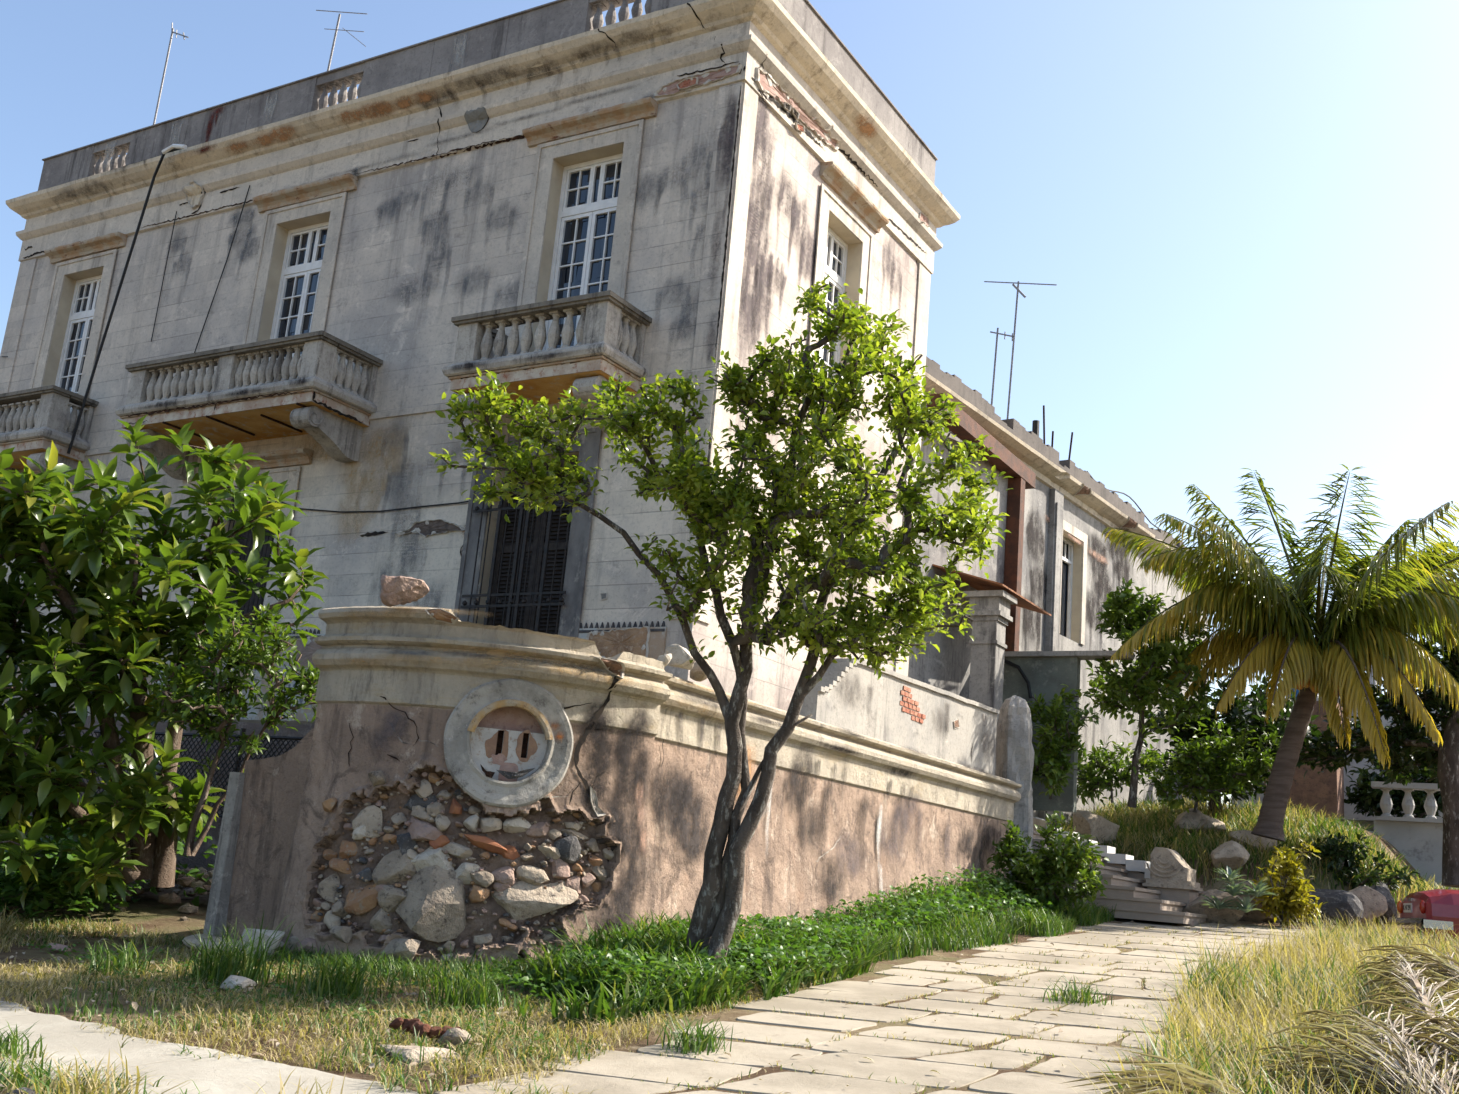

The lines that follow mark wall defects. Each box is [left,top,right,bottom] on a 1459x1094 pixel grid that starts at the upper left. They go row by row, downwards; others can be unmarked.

damp [718,102,736,175]
flaking render [654,64,841,152]
damp [741,92,816,337]
crack [677,3,926,356]
damp [859,116,875,137]
crack [543,676,619,805]
flaking render [900,686,926,723]
flaking render [308,767,616,965]
damp [583,705,709,939]
damp [790,744,855,840]
damp [823,841,859,902]
damp [860,768,916,854]